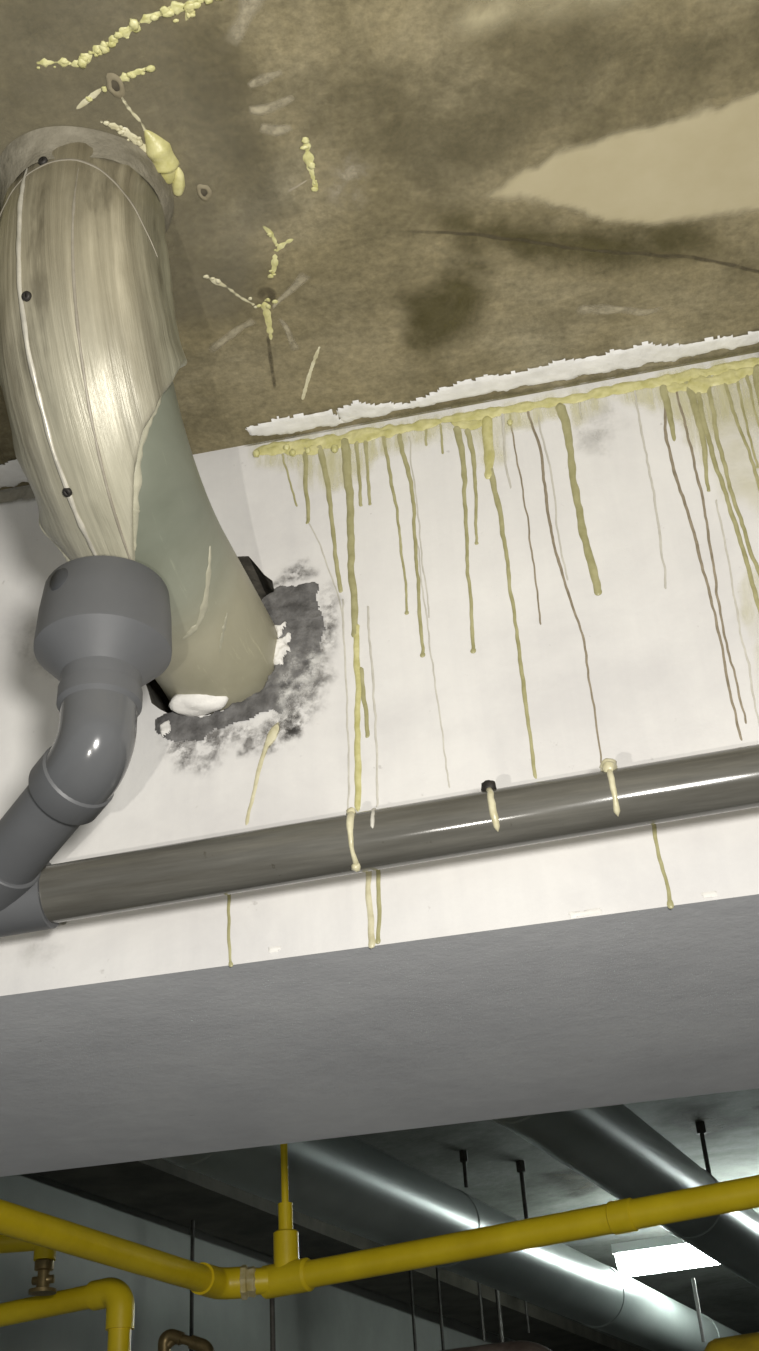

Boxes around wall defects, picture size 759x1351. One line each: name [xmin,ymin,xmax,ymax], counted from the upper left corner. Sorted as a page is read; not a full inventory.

damp [458,0,618,32]
peeling [489,91,759,225]
damp [454,220,699,261]
crack [441,232,759,272]
damp [410,278,479,348]
peeling [245,331,759,446]
peeling [0,459,35,503]
damp [253,357,759,948]
damp [245,722,280,825]